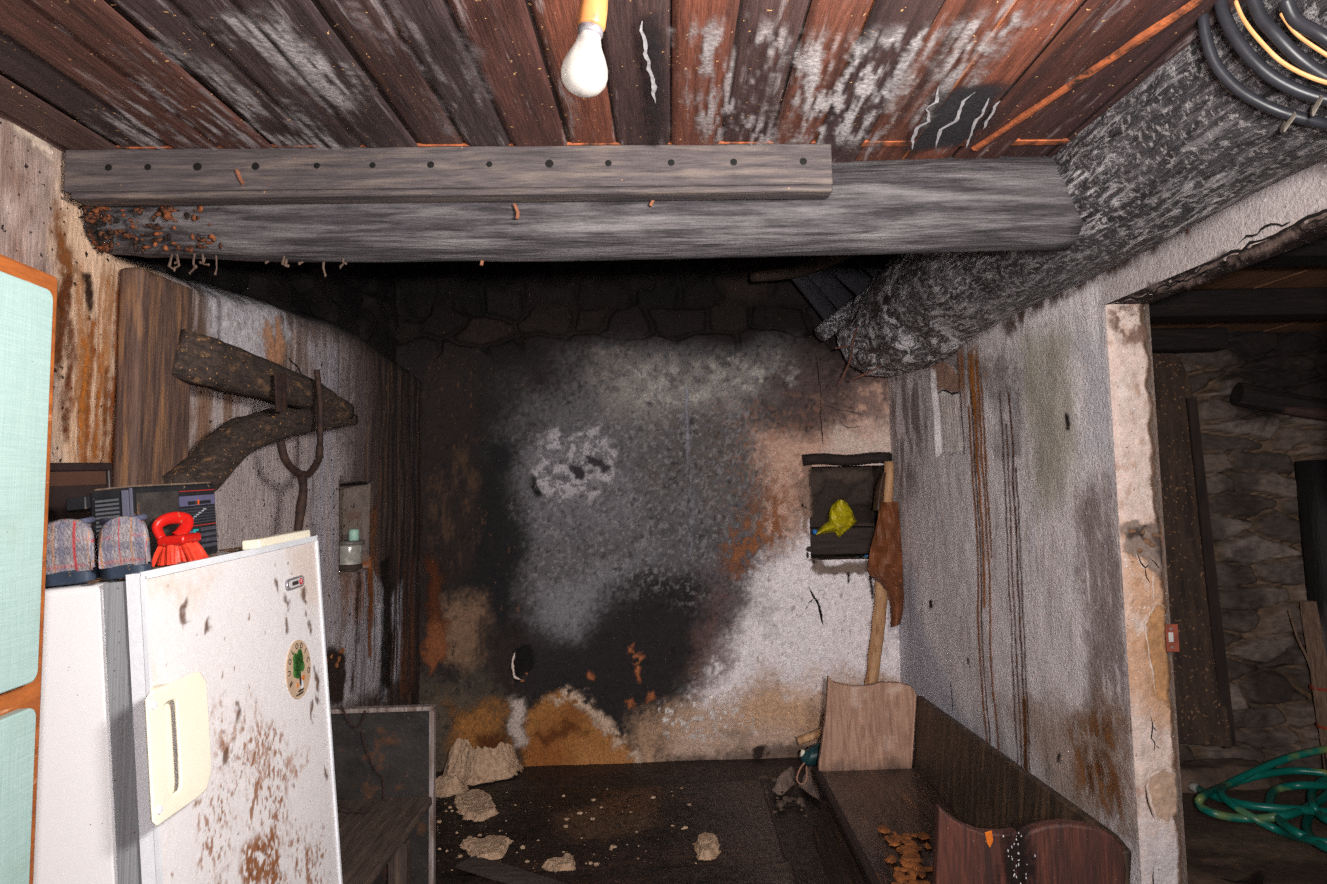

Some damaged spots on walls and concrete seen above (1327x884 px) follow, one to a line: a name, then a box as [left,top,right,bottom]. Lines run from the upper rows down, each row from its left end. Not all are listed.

mould [692,23,934,145]
water stain [903,13,1021,151]
rust [62,271,120,474]
rust [362,509,379,657]
rust [421,557,449,673]
flaking render [511,645,533,682]
water stain [999,392,1030,772]
water stain [448,686,642,766]
water stain [1068,713,1124,834]